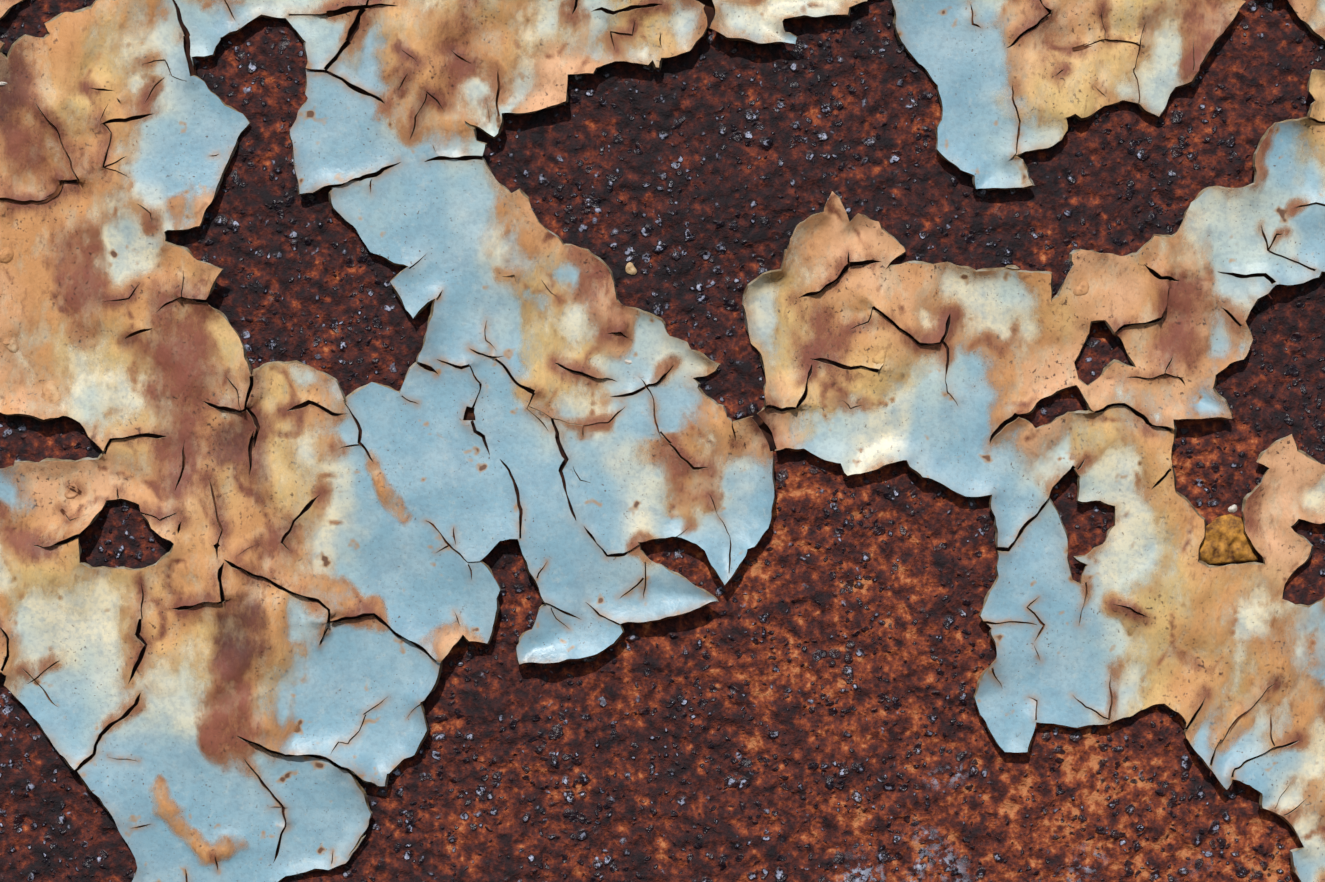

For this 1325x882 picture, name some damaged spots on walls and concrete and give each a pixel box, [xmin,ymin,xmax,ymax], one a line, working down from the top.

crack [0,0,197,204]
corrosion [0,0,434,882]
crack [76,433,436,770]
crack [204,377,373,475]
crack [289,0,483,192]
peeling [0,0,776,882]
crack [413,321,731,626]
peeling [625,0,868,70]
peeling [742,198,829,377]
corrosion [281,0,1325,882]
peeling [891,0,1235,190]
peeling [1126,69,1325,420]